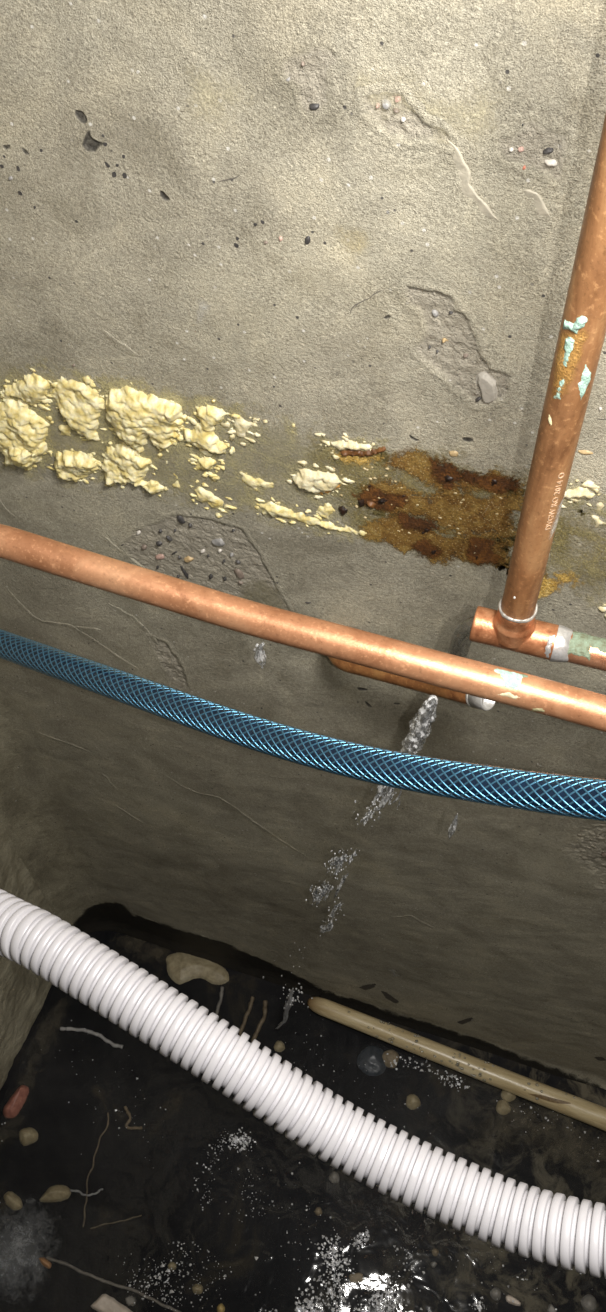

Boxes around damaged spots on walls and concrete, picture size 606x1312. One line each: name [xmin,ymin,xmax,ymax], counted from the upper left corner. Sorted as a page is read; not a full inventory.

water stain [0,368,375,536]
rust [313,446,525,568]
water stain [561,479,606,528]